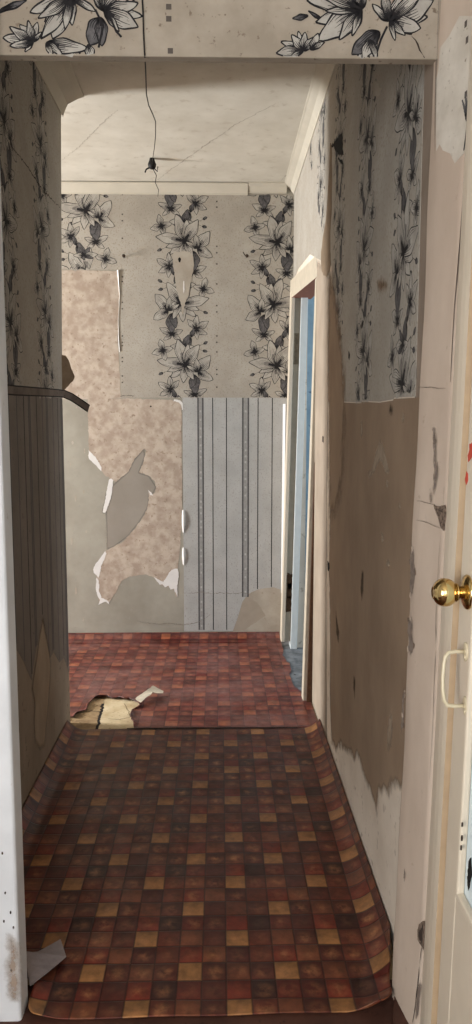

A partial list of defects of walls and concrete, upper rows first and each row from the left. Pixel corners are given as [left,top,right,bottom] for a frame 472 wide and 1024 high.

peeling [62,270,184,605]
peeling [172,251,194,314]